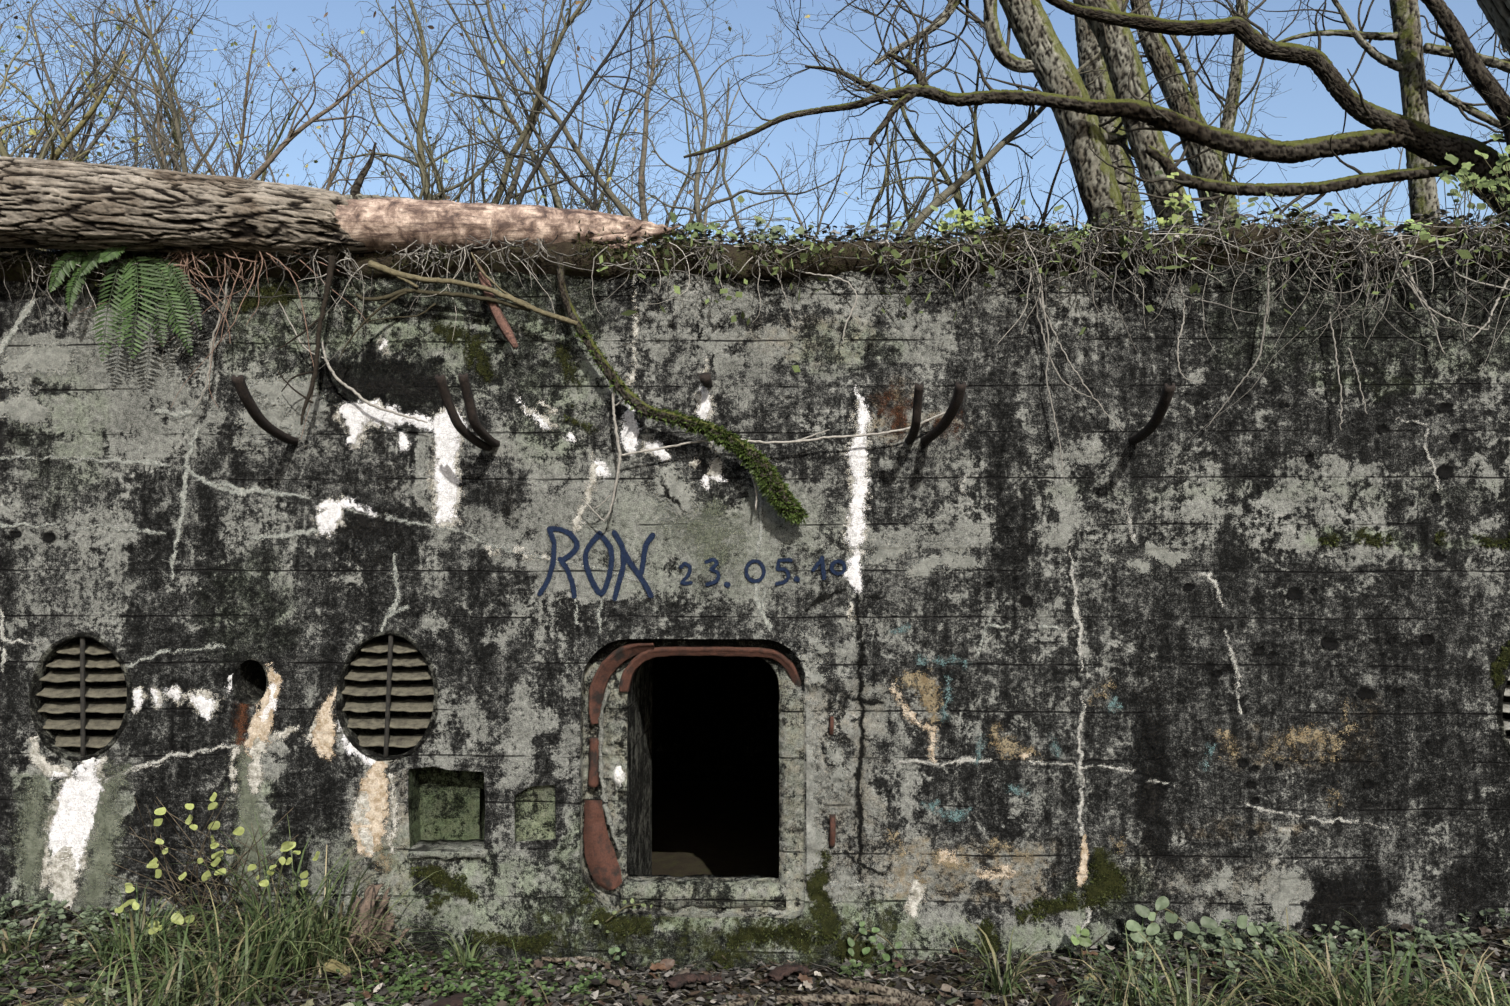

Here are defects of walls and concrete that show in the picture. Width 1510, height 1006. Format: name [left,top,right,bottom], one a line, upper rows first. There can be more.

crack [0,346,653,633]
water stain [305,333,550,567]
water stain [516,398,576,443]
water stain [620,405,671,464]
water stain [841,387,875,622]
corrosion [871,385,913,439]
water stain [27,736,111,913]
crack [101,743,239,784]
water stain [228,664,401,873]
crack [806,580,992,875]
crack [974,549,1169,931]
crack [1194,571,1242,715]